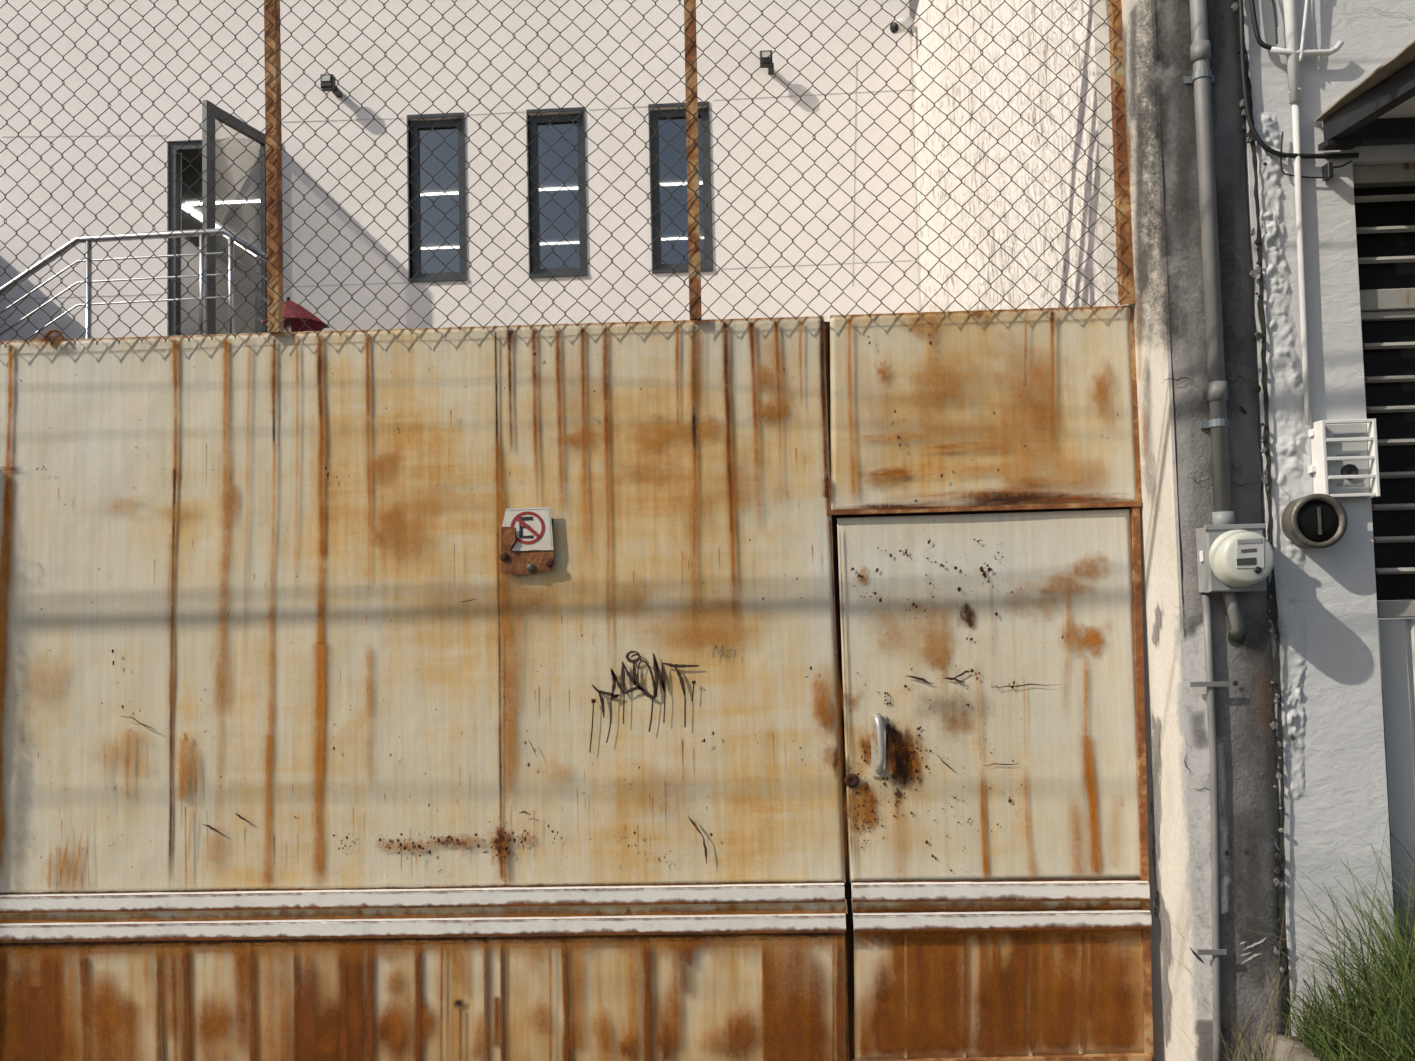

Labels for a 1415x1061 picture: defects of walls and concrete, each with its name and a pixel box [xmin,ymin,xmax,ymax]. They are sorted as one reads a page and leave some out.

leakage [1134,0,1194,341]
leakage [1207,0,1221,72]
leakage [1216,187,1235,411]
corrosion [0,305,1152,1061]